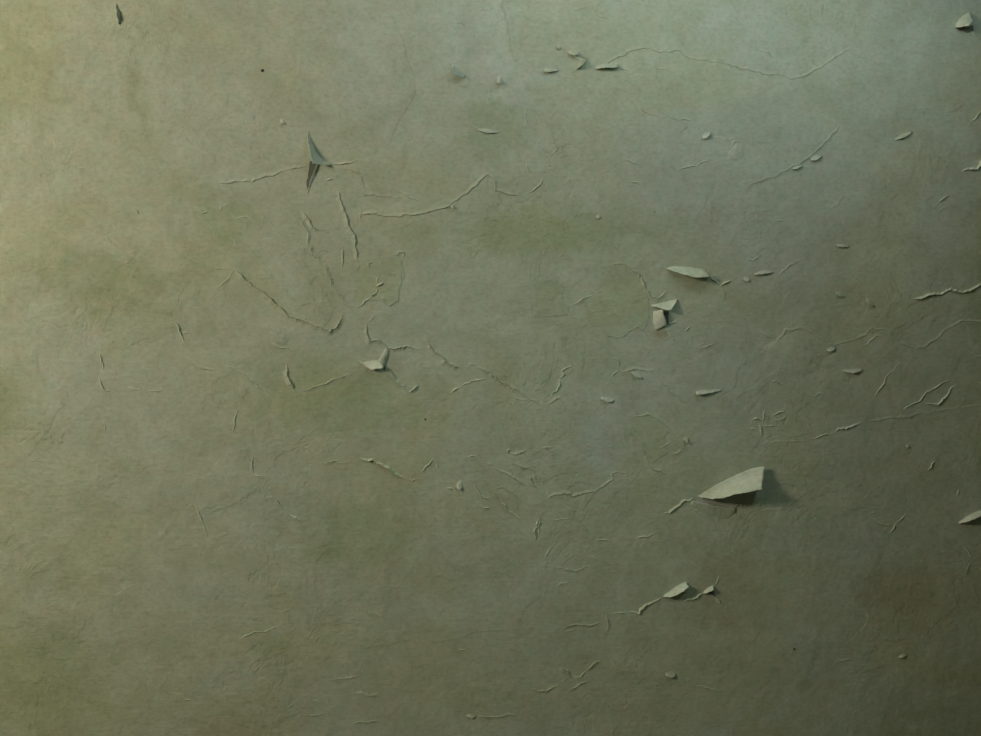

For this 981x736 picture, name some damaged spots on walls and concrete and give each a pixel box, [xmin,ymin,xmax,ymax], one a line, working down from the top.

peeling [955,11,978,38]
crack [747,126,840,189]
crack [962,160,981,171]
crack [189,172,572,407]
peeling [667,266,773,302]
crack [913,283,981,299]
peeling [651,299,690,343]
crack [765,380,980,444]
peeling [664,466,765,519]
crack [468,449,627,587]
peeling [958,510,981,524]
peeling [629,576,728,617]